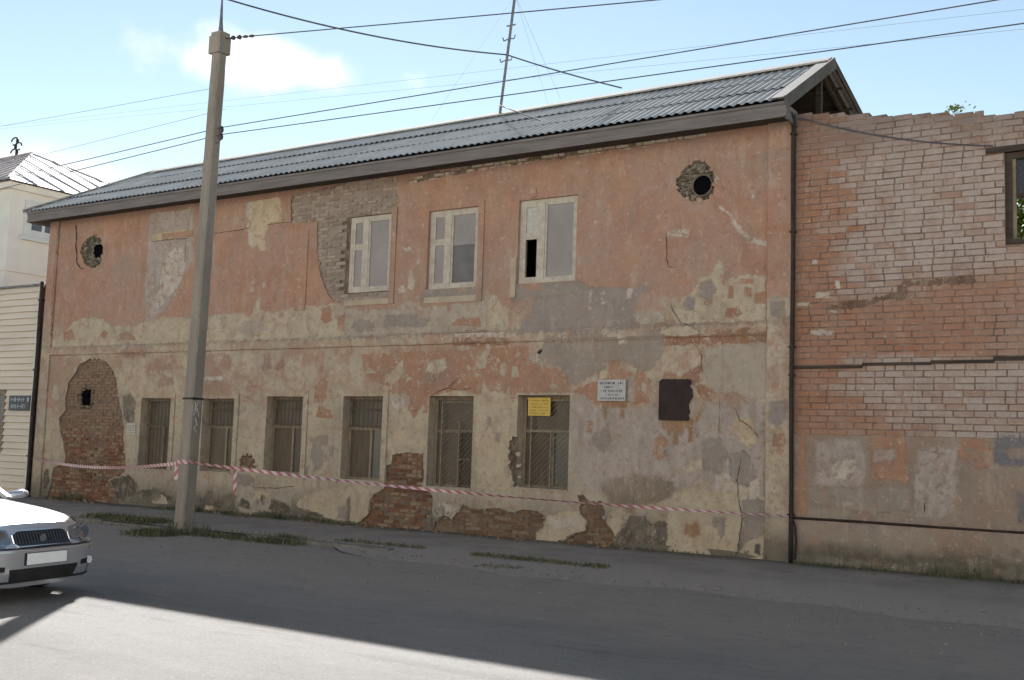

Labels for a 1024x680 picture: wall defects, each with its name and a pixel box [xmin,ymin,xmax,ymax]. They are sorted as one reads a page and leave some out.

spalling [48,206,195,503]
spalling [202,133,706,398]
peeling [195,293,868,560]
spalling [675,159,767,247]
crack [734,460,742,555]